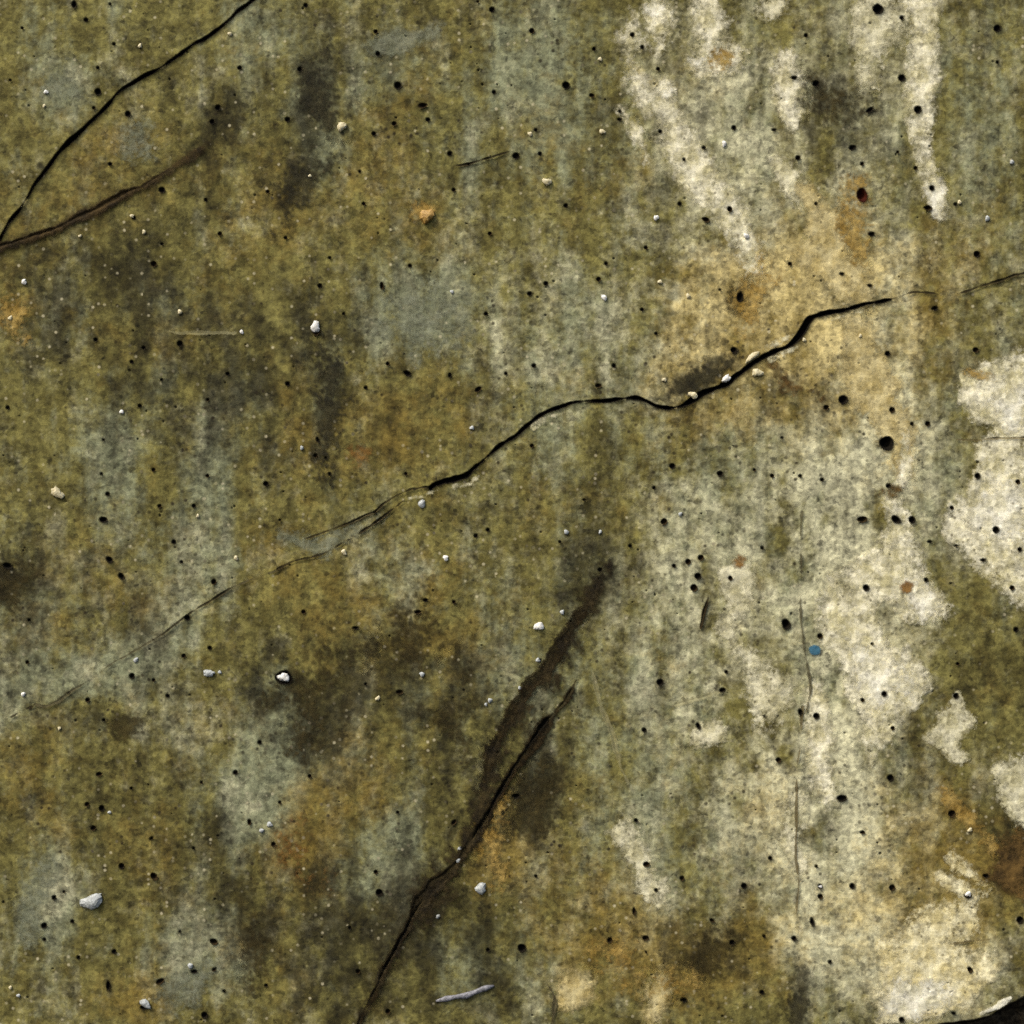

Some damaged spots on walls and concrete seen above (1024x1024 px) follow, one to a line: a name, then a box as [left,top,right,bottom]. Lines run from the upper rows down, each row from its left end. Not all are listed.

crack [0,0,254,252]
damp [614,0,677,61]
damp [618,73,765,273]
damp [685,0,751,81]
damp [753,0,788,19]
damp [769,47,806,130]
damp [848,0,948,220]
crack [961,272,1024,293]
crack [106,291,936,668]
crack [957,434,1024,442]
crack [355,559,613,1024]
crack [795,598,812,913]